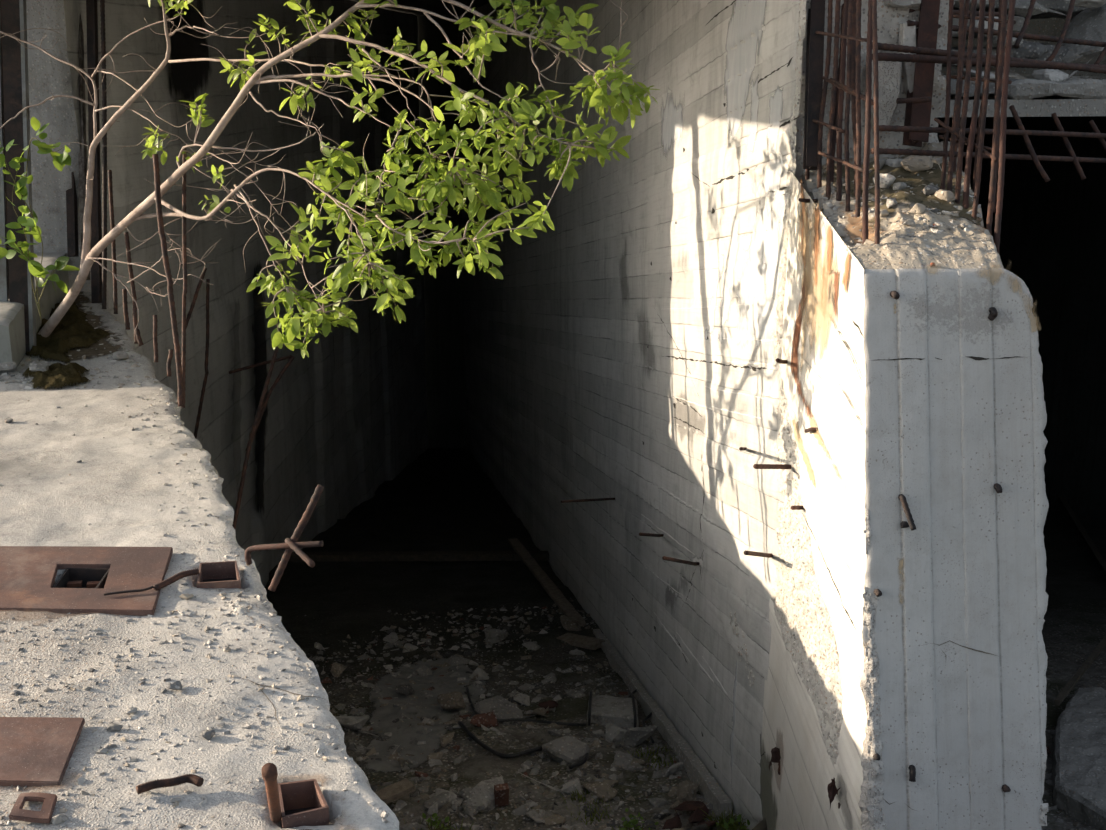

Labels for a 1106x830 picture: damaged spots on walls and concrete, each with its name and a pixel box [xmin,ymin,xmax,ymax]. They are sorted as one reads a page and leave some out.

spalling [771,0,843,764]
rust [790,184,884,486]
spalling [864,504,872,554]
spalling [863,585,887,830]
crack [921,640,997,666]